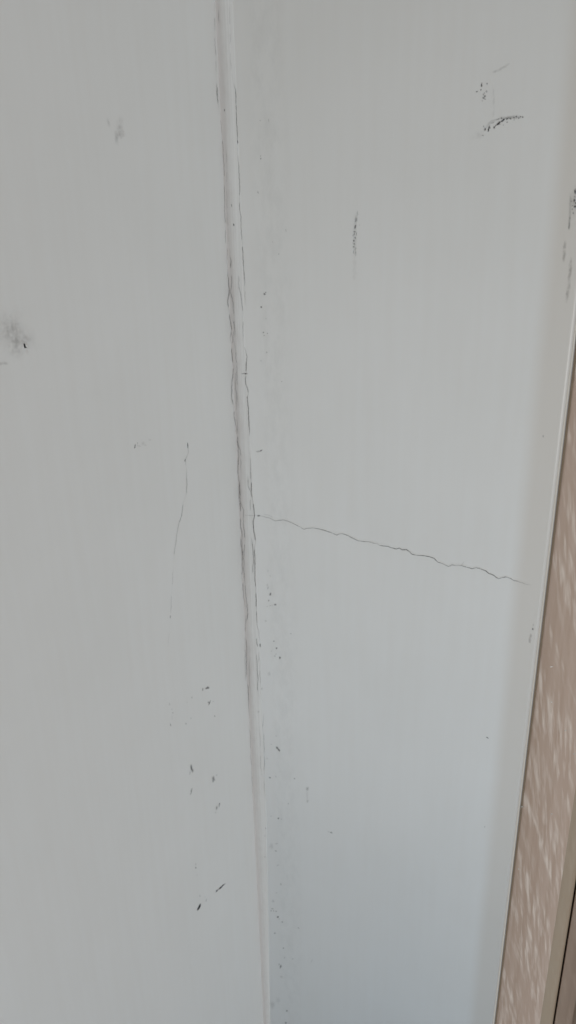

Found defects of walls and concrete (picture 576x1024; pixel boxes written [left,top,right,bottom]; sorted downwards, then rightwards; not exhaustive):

crack [251,486,529,585]